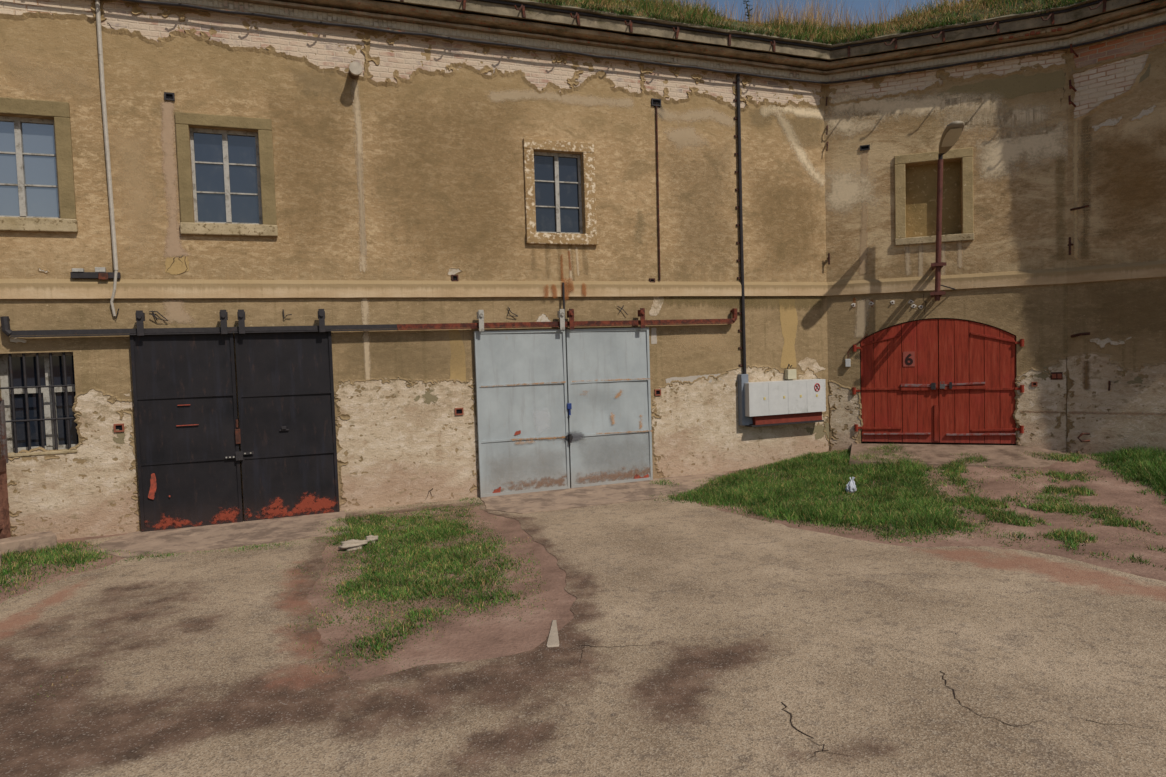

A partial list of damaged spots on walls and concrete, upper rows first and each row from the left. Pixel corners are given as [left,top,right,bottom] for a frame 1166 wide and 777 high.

spalling [0,0,1166,133]
peeling [0,375,501,540]
corrosion [509,467,650,490]
peeling [634,357,863,479]
peeling [1013,337,1166,455]